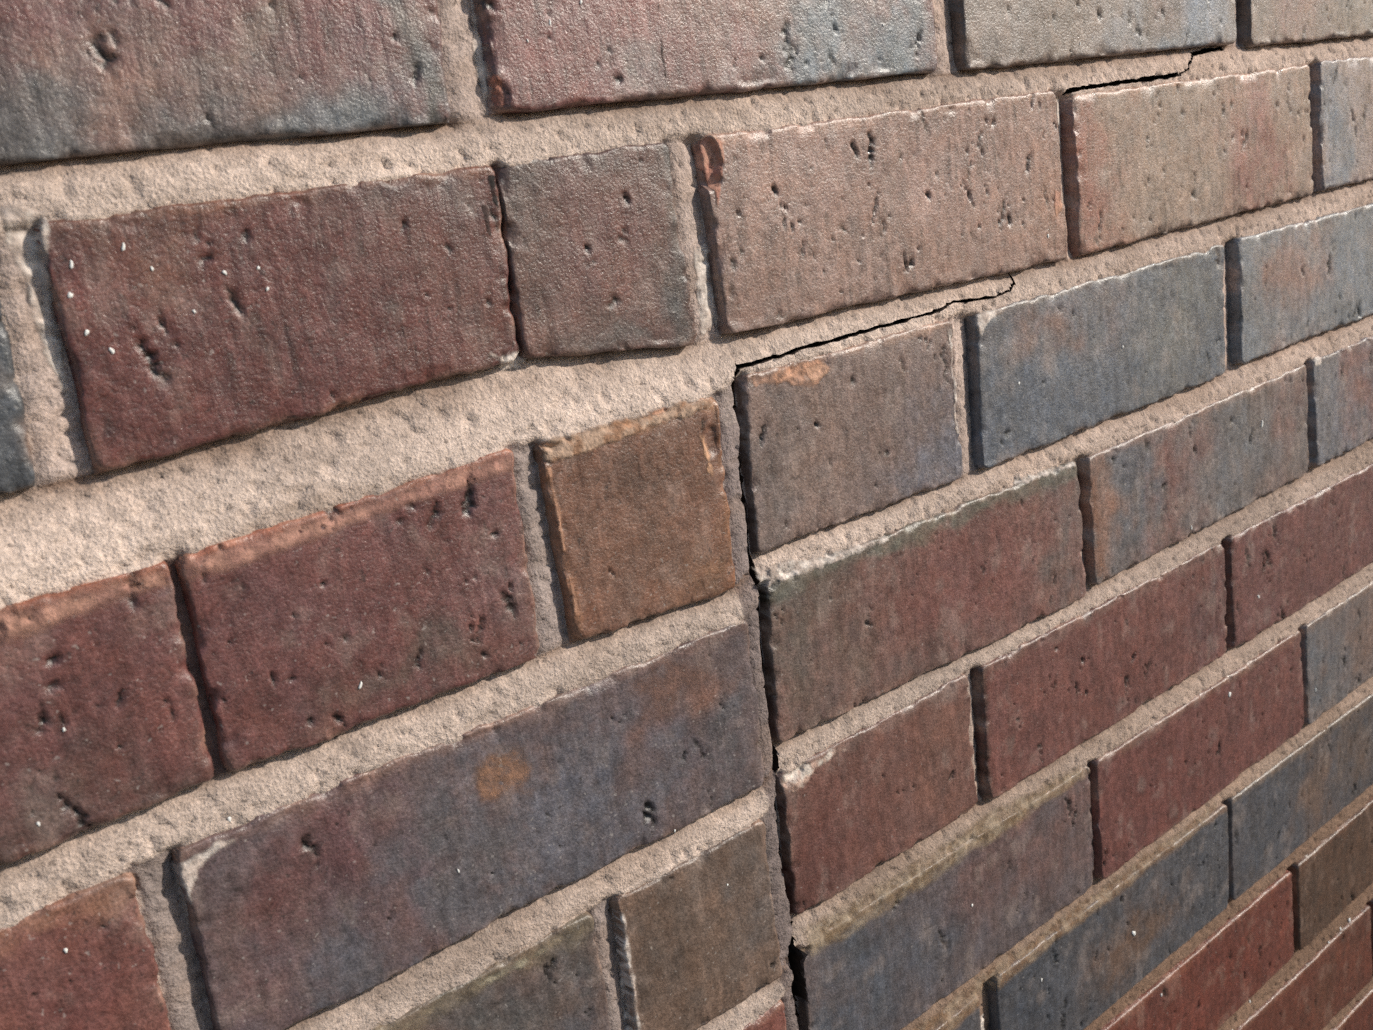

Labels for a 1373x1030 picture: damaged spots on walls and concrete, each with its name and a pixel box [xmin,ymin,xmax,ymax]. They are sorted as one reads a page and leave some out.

crack [1062,48,1214,95]
crack [731,273,1014,407]
crack [737,457,764,676]
crack [772,745,782,873]
crack [788,922,807,1016]